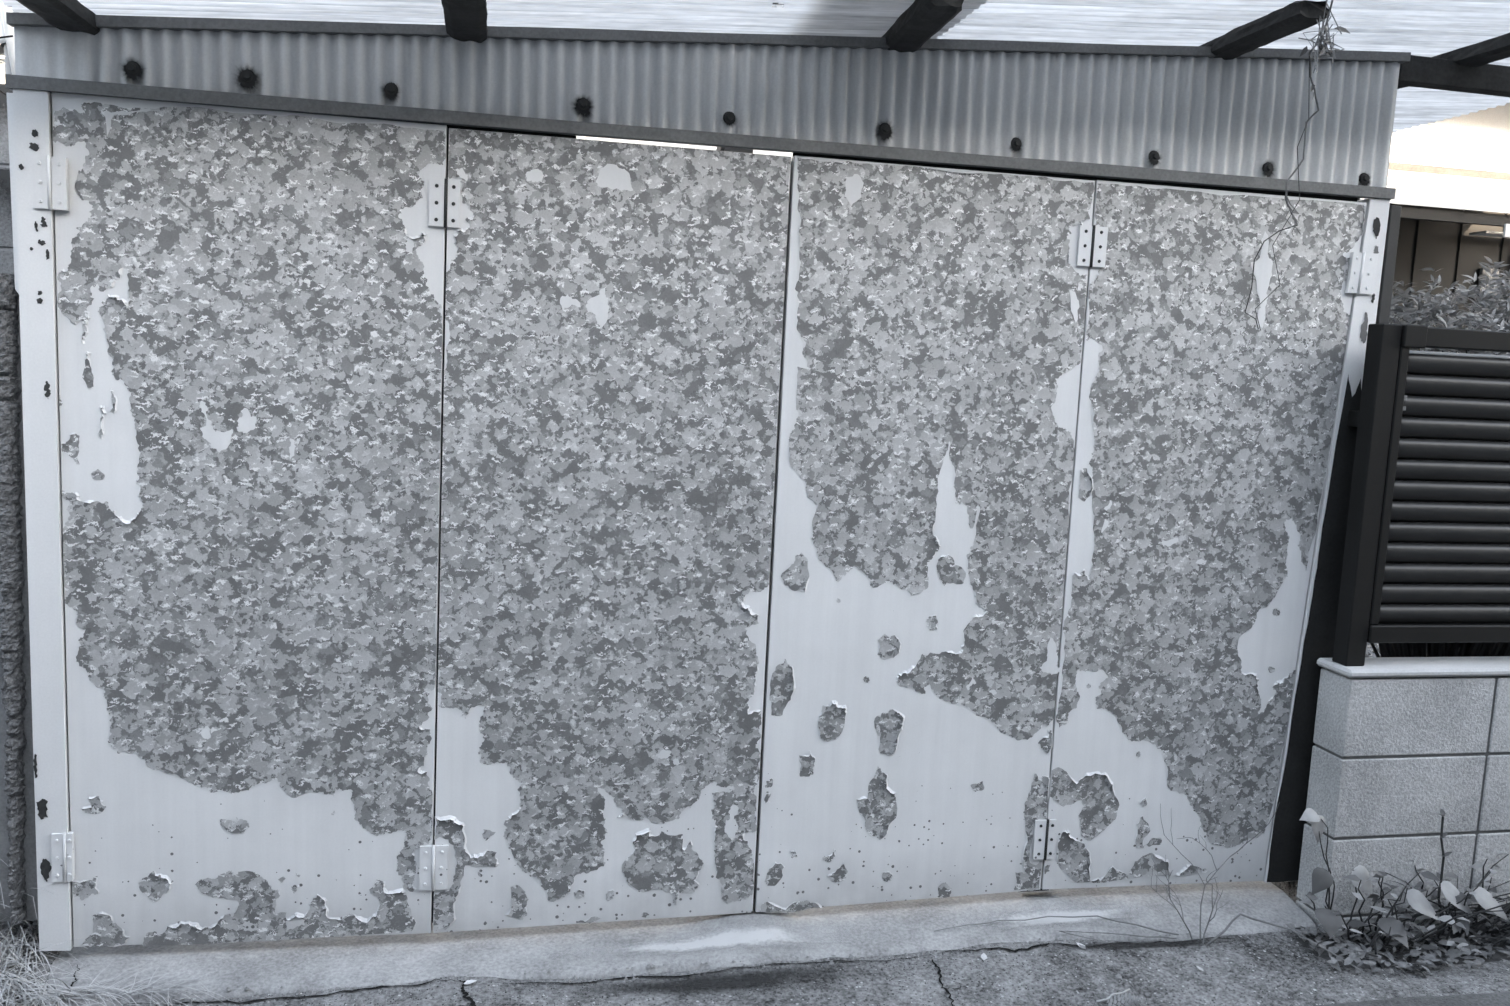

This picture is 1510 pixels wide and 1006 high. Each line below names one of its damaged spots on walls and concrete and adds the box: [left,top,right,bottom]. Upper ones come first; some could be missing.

peeling [52,101,1366,949]
crack [164,937,1233,1006]